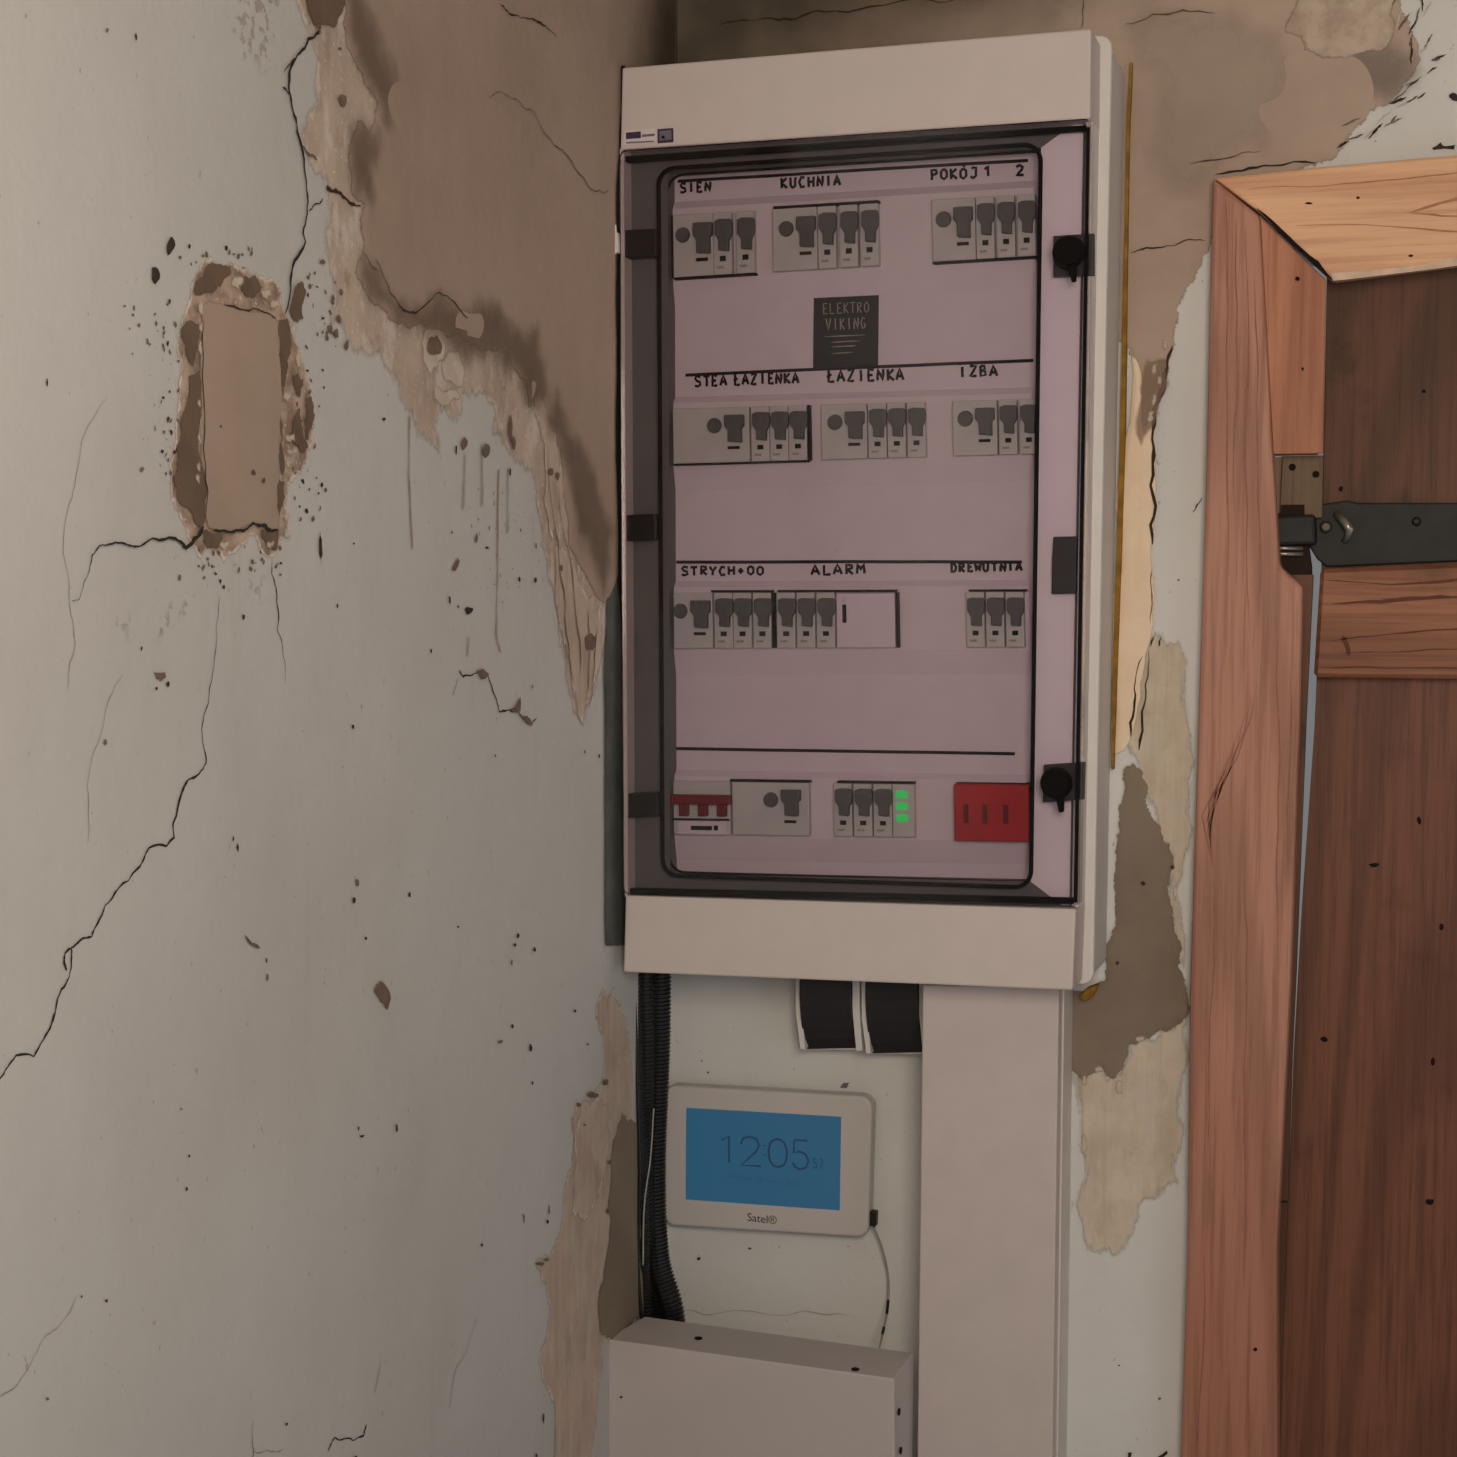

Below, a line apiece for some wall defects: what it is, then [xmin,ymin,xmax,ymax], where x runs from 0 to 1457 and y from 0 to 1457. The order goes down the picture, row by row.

crack [63,26,361,686]
flaking render [124,0,663,725]
crack [365,254,469,319]
flaking render [740,0,1446,441]
crack [0,596,220,1079]
flaking render [1072,633,1194,1255]
peeling [536,989,644,1457]